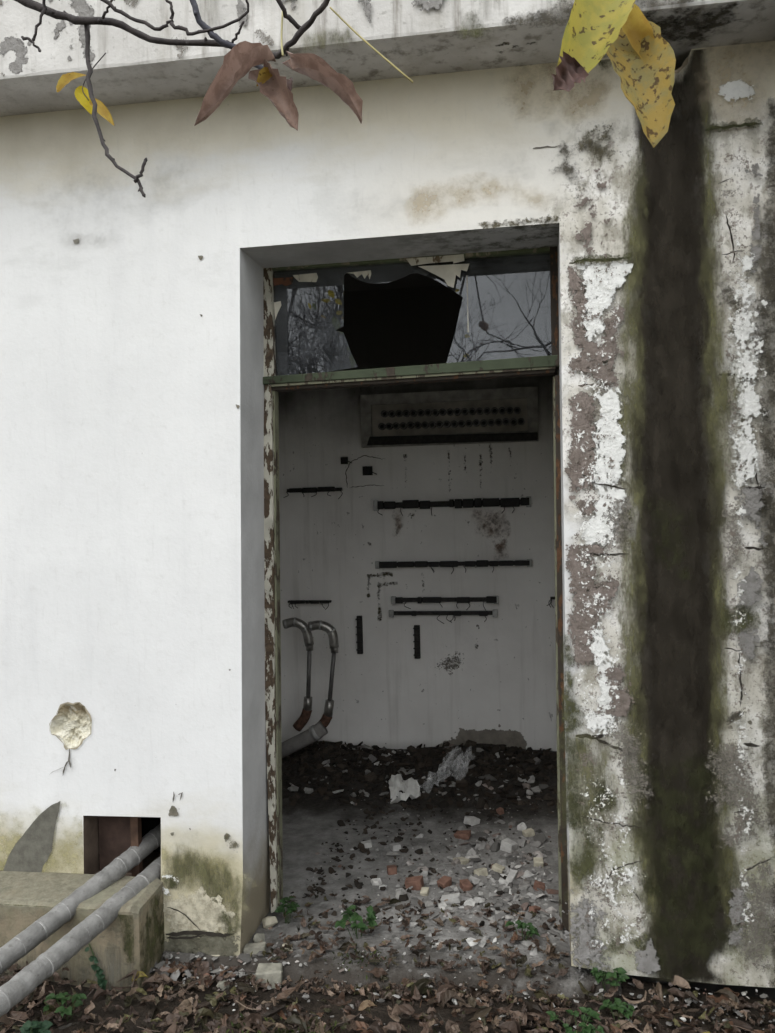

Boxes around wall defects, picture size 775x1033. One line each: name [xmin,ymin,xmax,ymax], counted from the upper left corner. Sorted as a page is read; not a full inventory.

peeling [0,36,31,74]
peeling [54,0,95,65]
peeling [235,0,274,46]
peeling [358,0,372,23]
water stain [504,0,574,27]
water stain [554,123,614,198]
peeling [564,266,626,516]
water stain [604,0,755,982]
water stain [754,99,775,845]
peeling [565,544,635,721]
peeling [560,875,612,980]